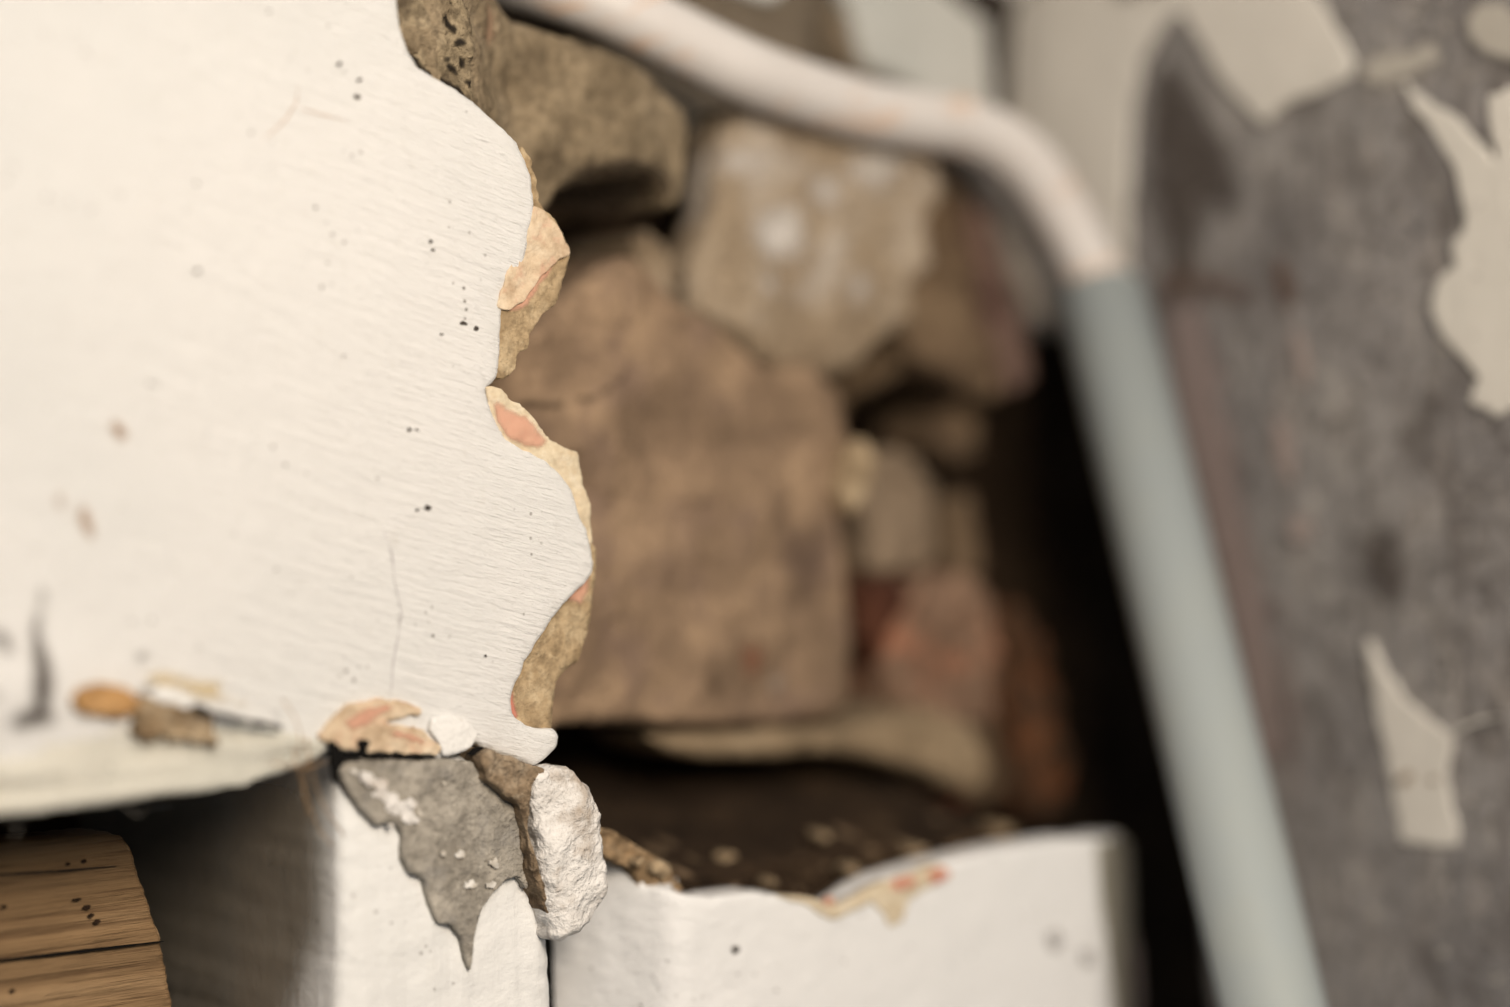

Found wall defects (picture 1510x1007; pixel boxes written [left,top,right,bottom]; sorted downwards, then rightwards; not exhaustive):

peeling [836,0,1356,272]
peeling [1403,82,1510,416]
spalling [316,0,1212,1007]
peeling [1366,640,1501,846]